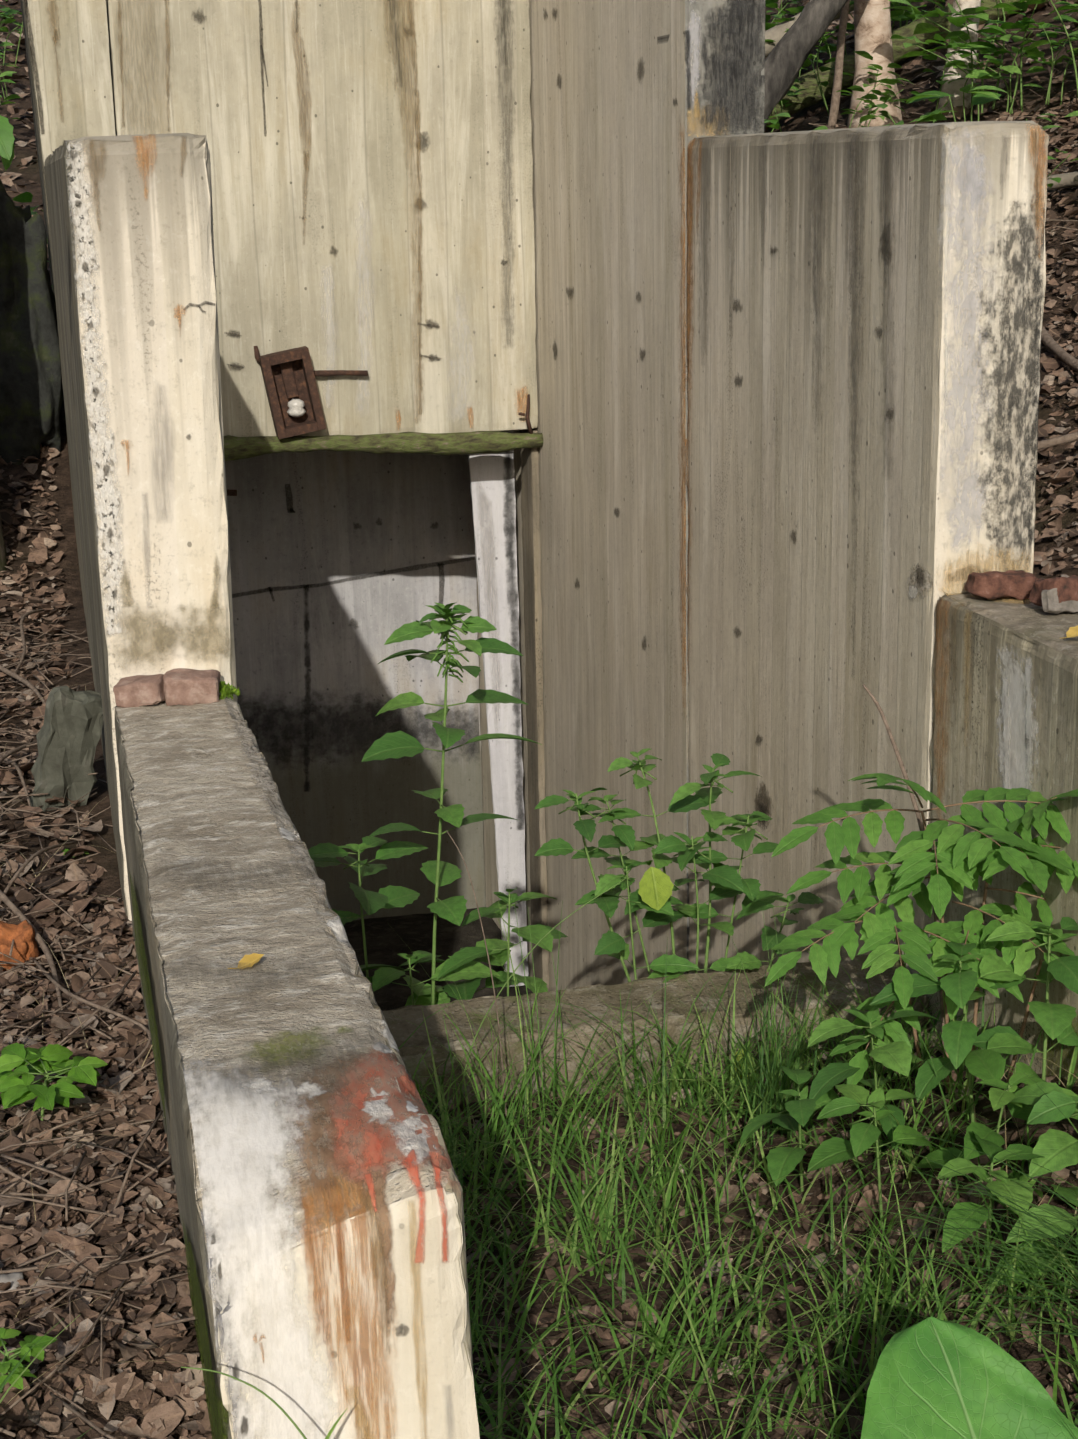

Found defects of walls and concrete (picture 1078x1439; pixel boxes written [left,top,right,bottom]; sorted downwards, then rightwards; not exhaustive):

water stain [657,0,765,135]
rust [680,134,701,679]
water stain [982,193,1045,571]
water stain [237,586,479,791]
peeling [336,1074,434,1164]
rust [303,1175,390,1439]